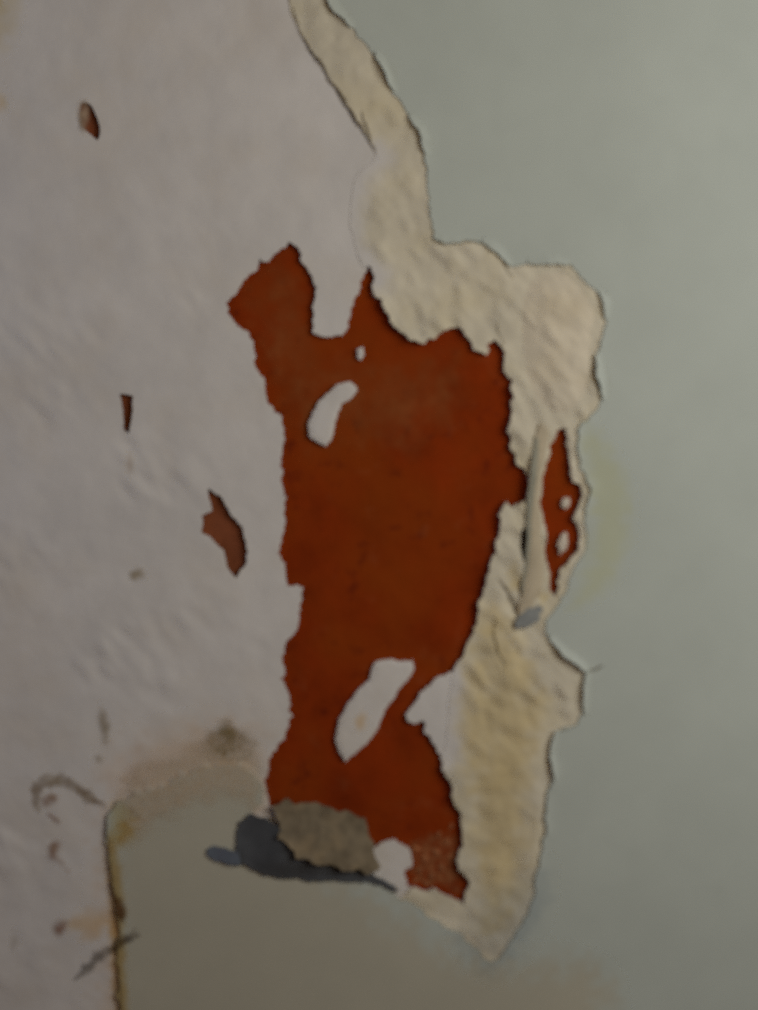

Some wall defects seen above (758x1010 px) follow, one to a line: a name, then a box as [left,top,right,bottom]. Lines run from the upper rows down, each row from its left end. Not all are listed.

peeling [0,0,400,1010]
spalling [226,242,529,904]
peeling [289,0,613,962]